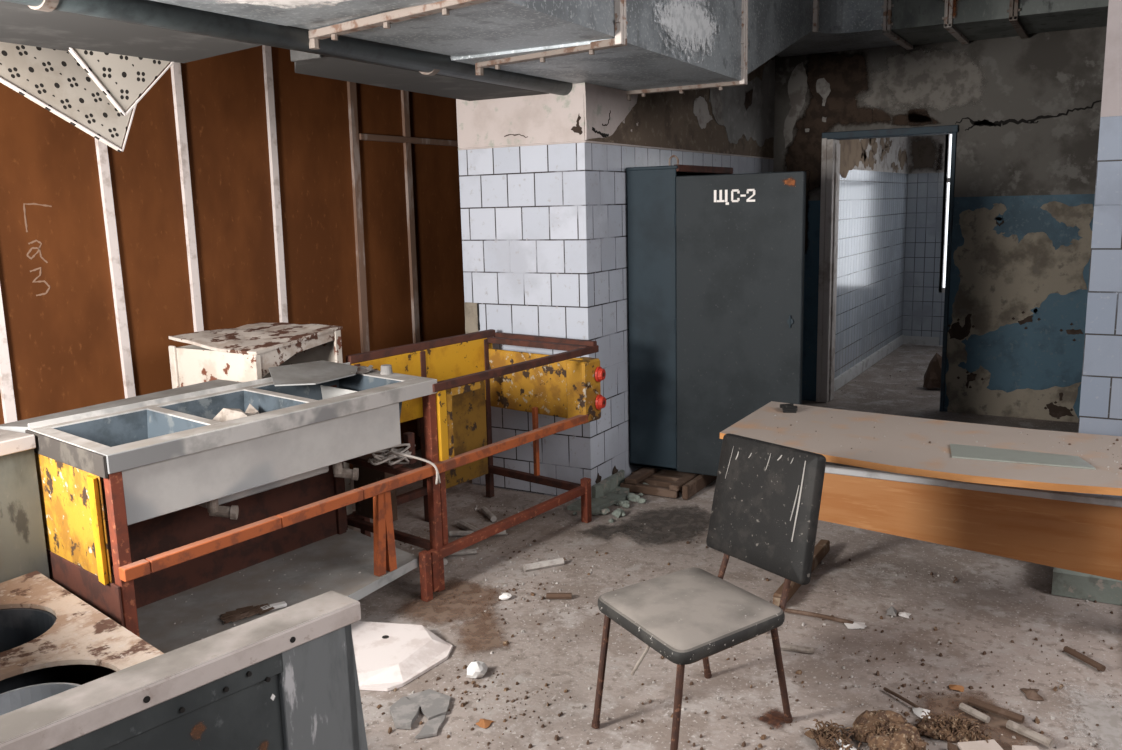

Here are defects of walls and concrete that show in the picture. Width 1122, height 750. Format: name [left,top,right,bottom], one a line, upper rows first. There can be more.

peeling [860,48,985,112]
crack [955,100,1102,131]
peeling [945,201,1094,423]